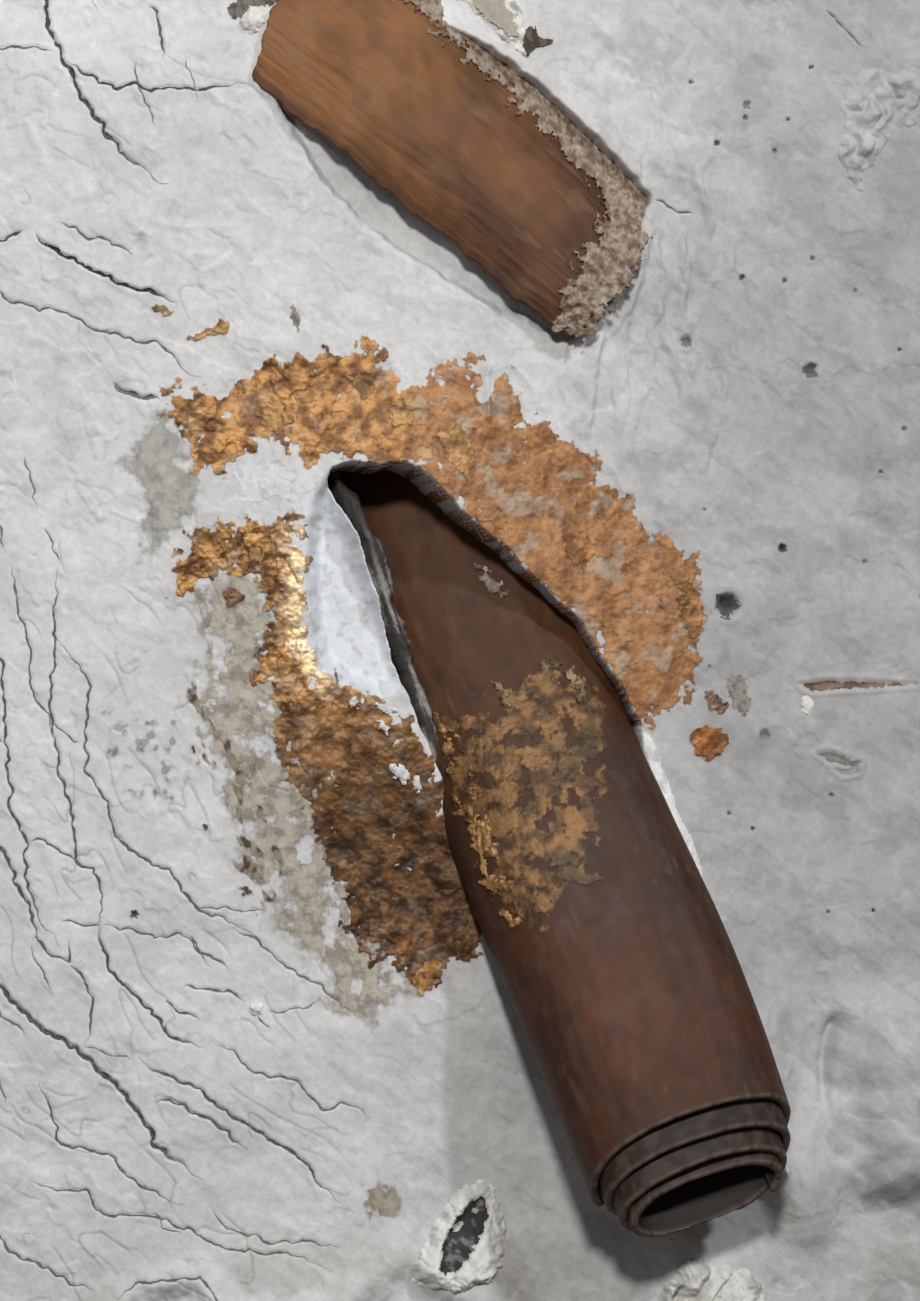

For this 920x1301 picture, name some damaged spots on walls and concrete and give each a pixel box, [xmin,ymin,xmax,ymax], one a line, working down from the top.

crack [0,0,245,185]
spalling [227,0,278,34]
spalling [460,0,553,57]
crack [0,222,178,302]
crack [0,291,202,378]
leakage [124,409,199,552]
leakage [115,722,175,799]
crack [0,459,371,1271]
corrosion [186,682,283,904]
leakage [195,571,420,1023]
peeling [431,711,514,894]
spalling [635,731,704,881]